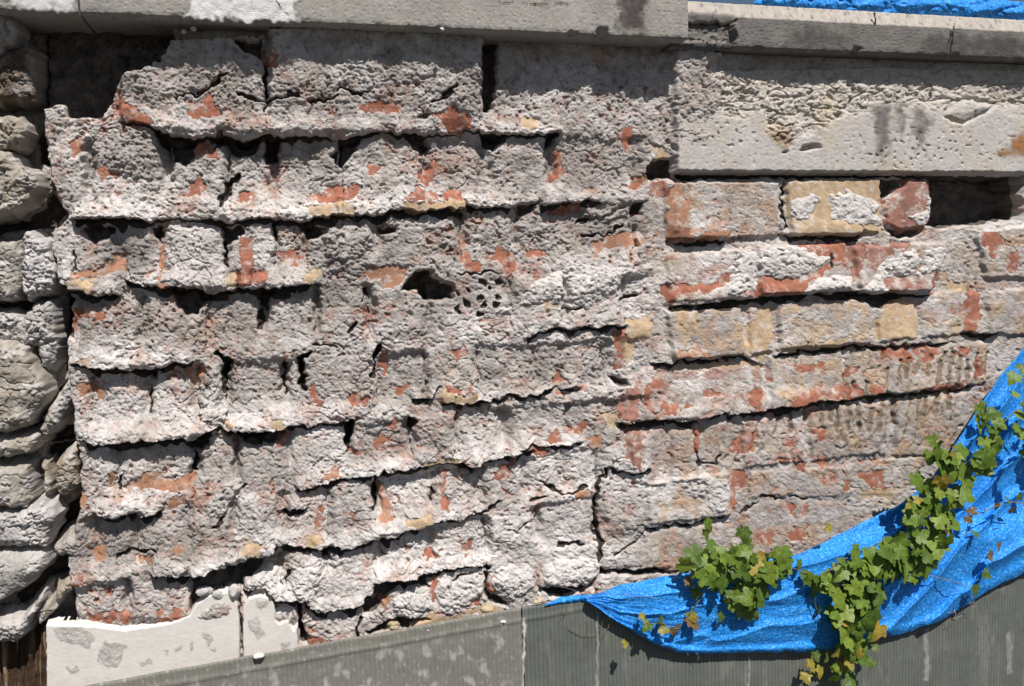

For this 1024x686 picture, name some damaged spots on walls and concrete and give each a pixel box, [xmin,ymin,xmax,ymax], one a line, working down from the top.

damp [876,103,904,153]
damp [916,110,929,141]
crack [217,170,244,208]
crack [281,288,368,395]
spalling [531,175,1019,472]
crack [214,350,234,393]
crack [343,419,354,452]
spalling [772,427,830,485]
spalling [728,469,748,509]
spalling [843,469,899,501]
crack [508,468,647,563]
spalling [786,502,809,542]